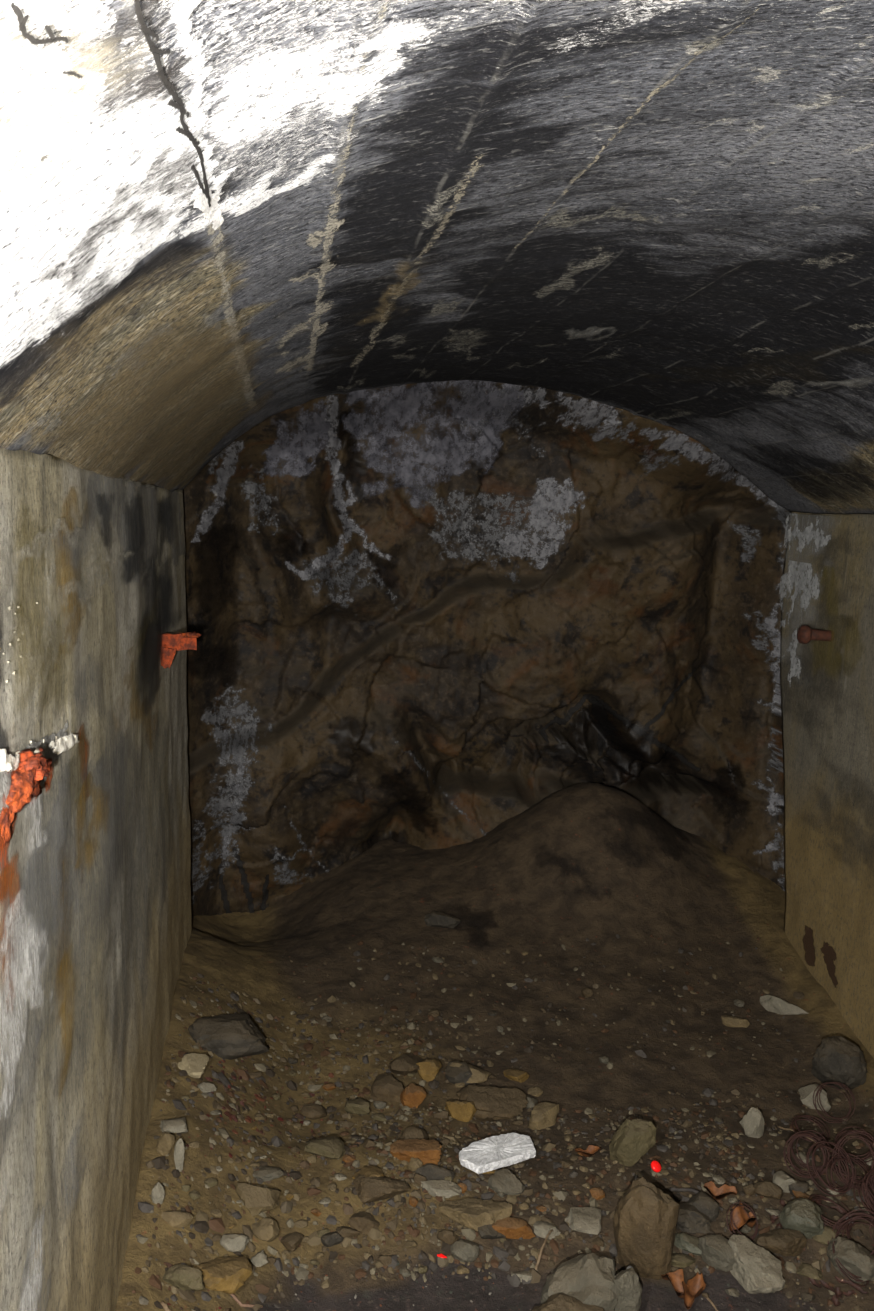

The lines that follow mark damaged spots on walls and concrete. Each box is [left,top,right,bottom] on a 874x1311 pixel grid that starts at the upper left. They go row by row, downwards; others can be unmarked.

crack [11,2,83,79]
crack [134,0,211,207]
water stain [0,0,834,910]
corrosion [0,798,20,1010]